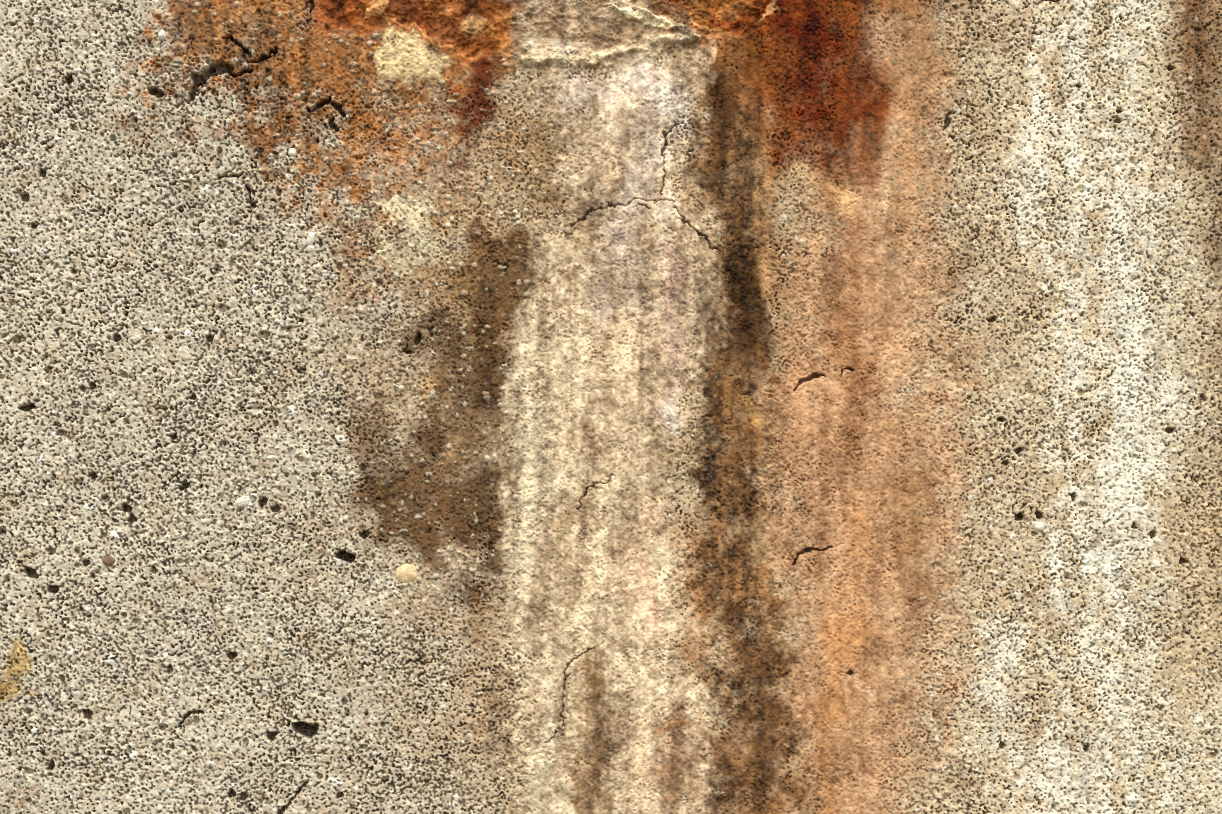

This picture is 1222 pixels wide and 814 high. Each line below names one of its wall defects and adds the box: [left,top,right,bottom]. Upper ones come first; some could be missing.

crack [187,35,278,104]
peeling [311,0,740,93]
spalling [754,0,788,24]
rust [104,0,522,323]
crack [570,123,714,250]
water stain [337,45,821,814]